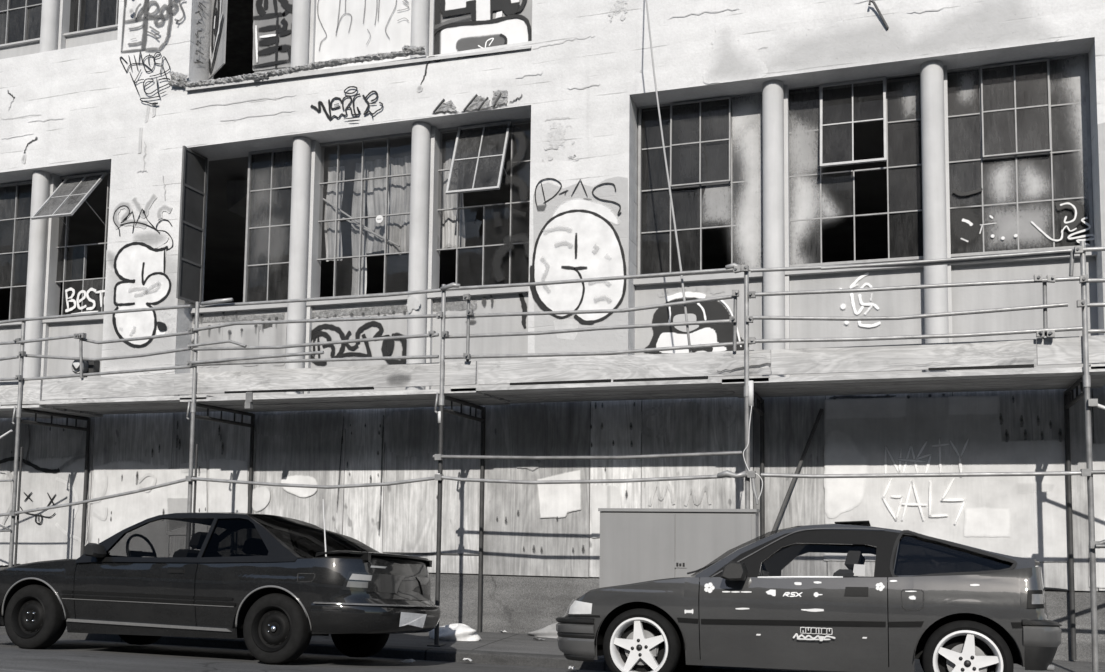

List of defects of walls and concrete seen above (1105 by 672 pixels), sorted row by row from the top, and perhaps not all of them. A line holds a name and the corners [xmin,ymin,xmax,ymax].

crack [669,8,739,19]
crack [906,5,958,13]